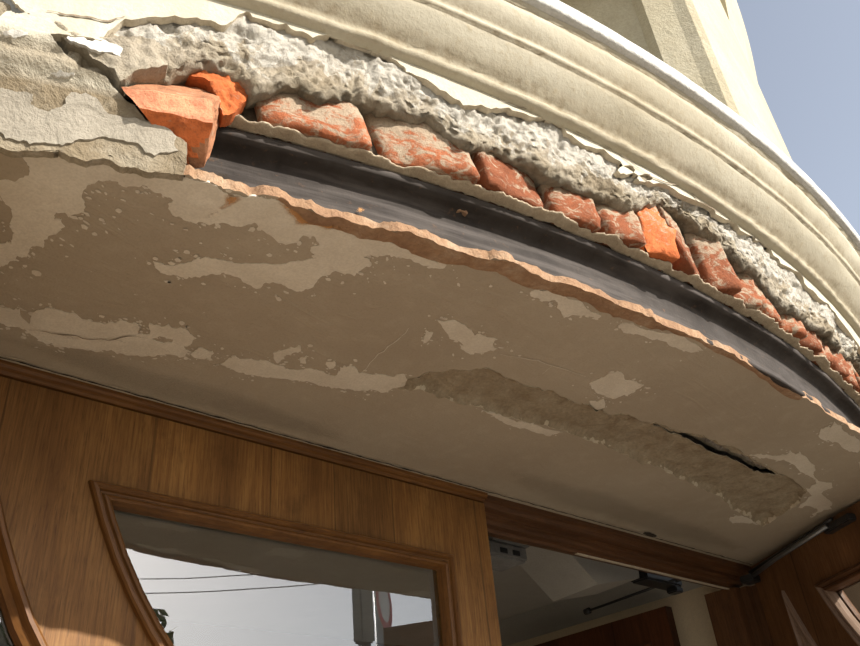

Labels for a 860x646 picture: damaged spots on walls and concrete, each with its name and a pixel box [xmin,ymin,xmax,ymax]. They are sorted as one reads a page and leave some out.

flaking render [0,0,24,16]
flaking render [0,15,860,400]
flaking render [0,298,837,526]
peeling [813,422,860,452]